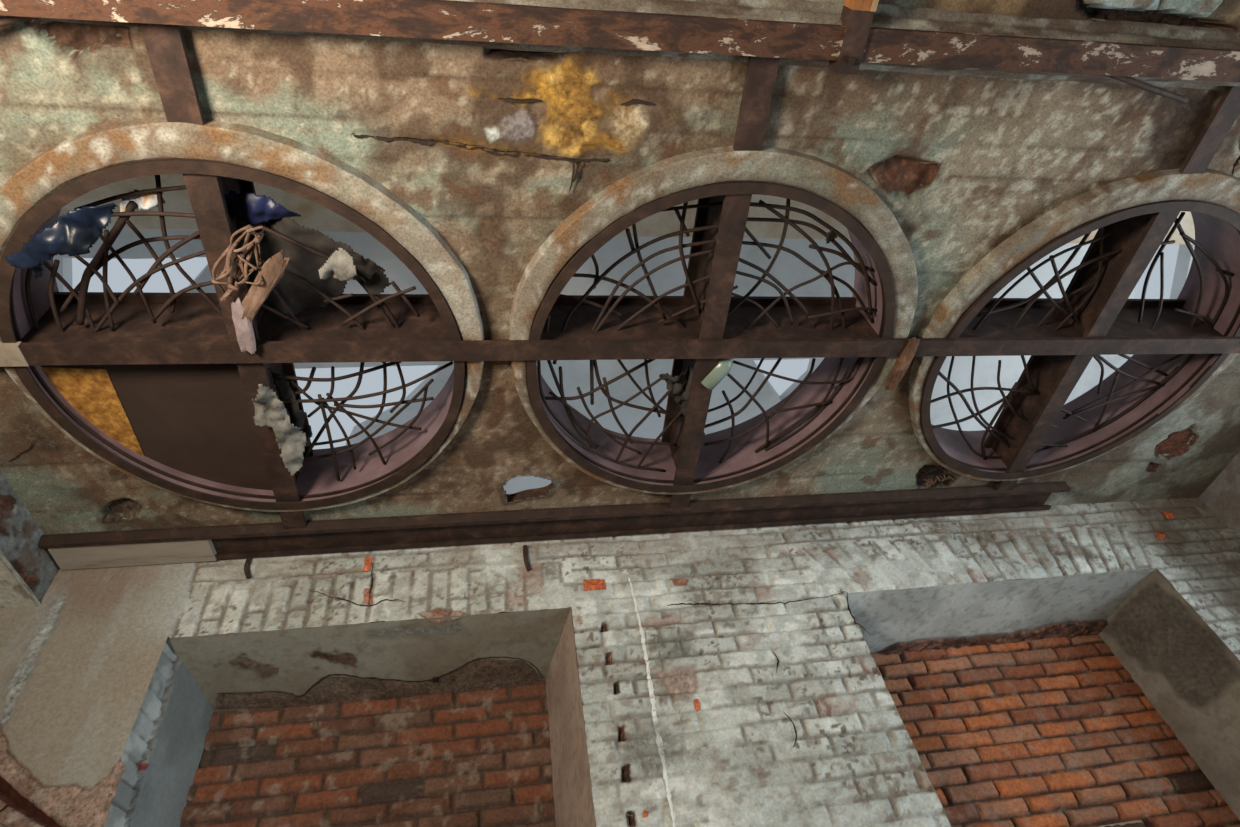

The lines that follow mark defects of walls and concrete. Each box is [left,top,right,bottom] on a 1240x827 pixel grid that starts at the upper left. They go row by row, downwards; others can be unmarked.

crack [498,96,541,104]
damp [485,59,647,157]
crack [621,98,653,106]
crack [354,135,609,191]
spalling [867,156,940,194]
spalling [1146,428,1197,472]
corrosion [0,495,16,536]
corrosion [11,560,39,588]
spalling [0,725,148,827]